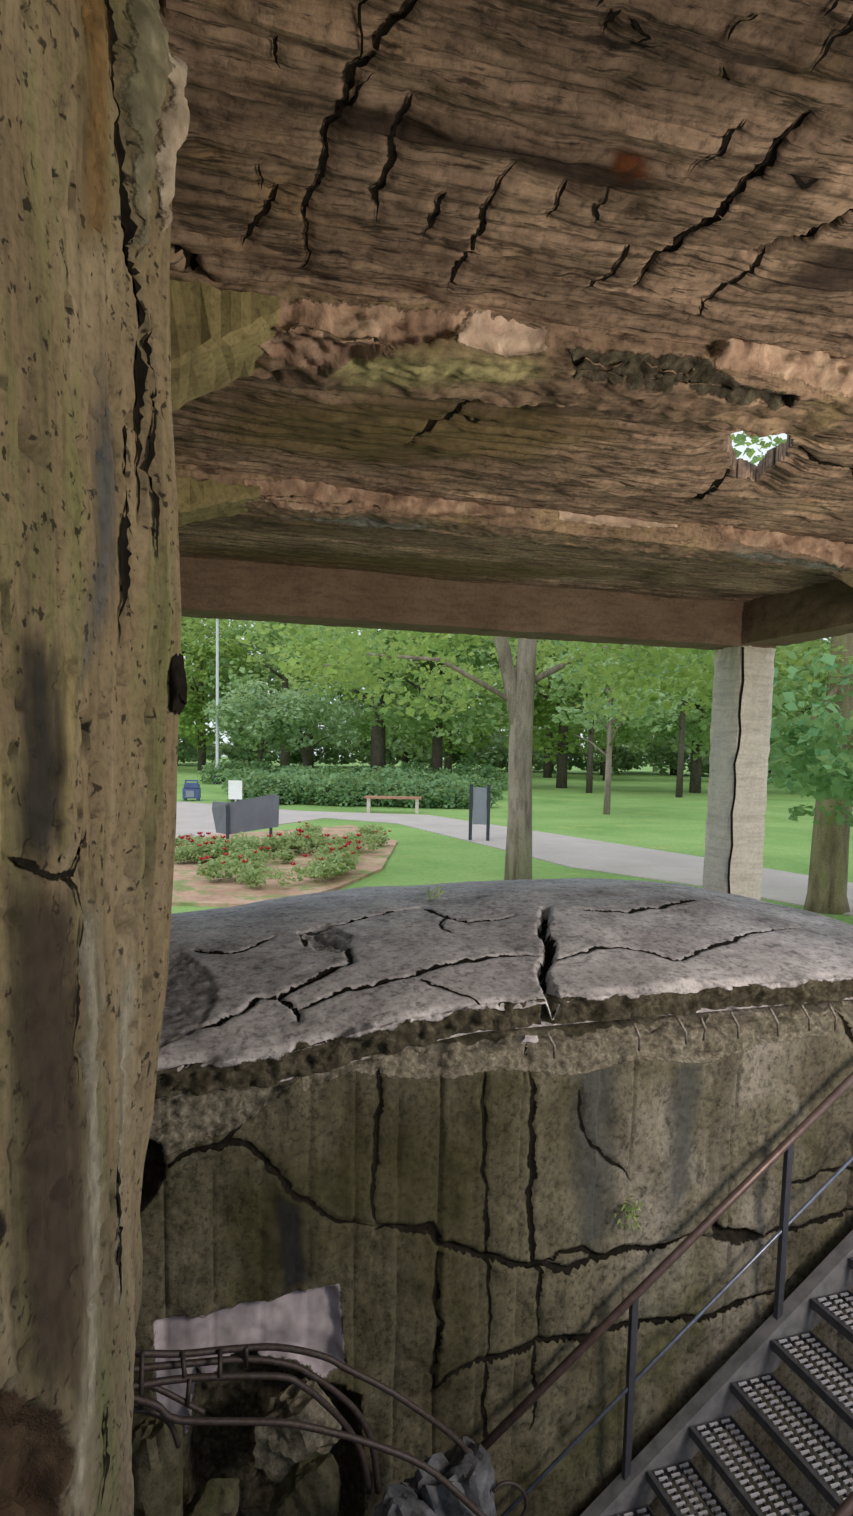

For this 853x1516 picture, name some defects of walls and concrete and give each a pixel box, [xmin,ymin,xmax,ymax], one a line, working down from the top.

crack [242,0,417,269]
crack [104,0,160,648]
crack [175,245,199,271]
crack [447,161,517,289]
crack [546,180,609,224]
crack [581,111,822,292]
crack [689,209,853,318]
crack [410,399,481,442]
crack [688,469,730,499]
crack [194,647,790,1029]
crack [834,1010,853,1042]
crack [116,1044,853,1439]